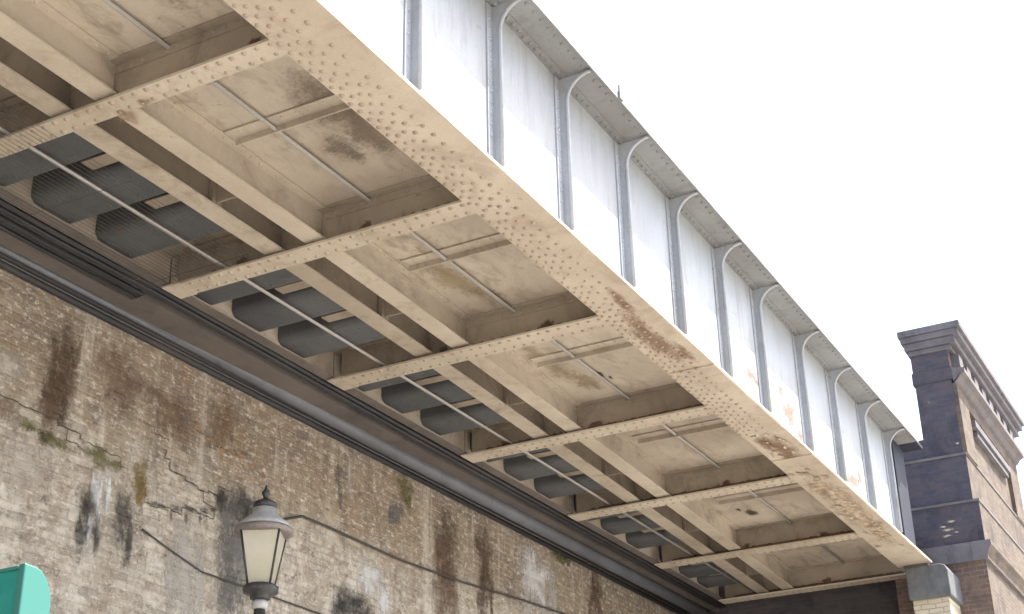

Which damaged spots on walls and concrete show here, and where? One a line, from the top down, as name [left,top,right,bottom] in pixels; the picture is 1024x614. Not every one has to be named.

rust [612,293,692,359]
leakage [41,324,78,441]
crack [0,394,127,469]
crack [145,405,233,511]
rust [750,430,801,459]
leakage [76,463,147,557]
leakage [218,495,253,614]
leakage [357,563,390,614]
leakage [435,524,457,614]
leakage [475,530,494,614]
rust [670,469,904,561]